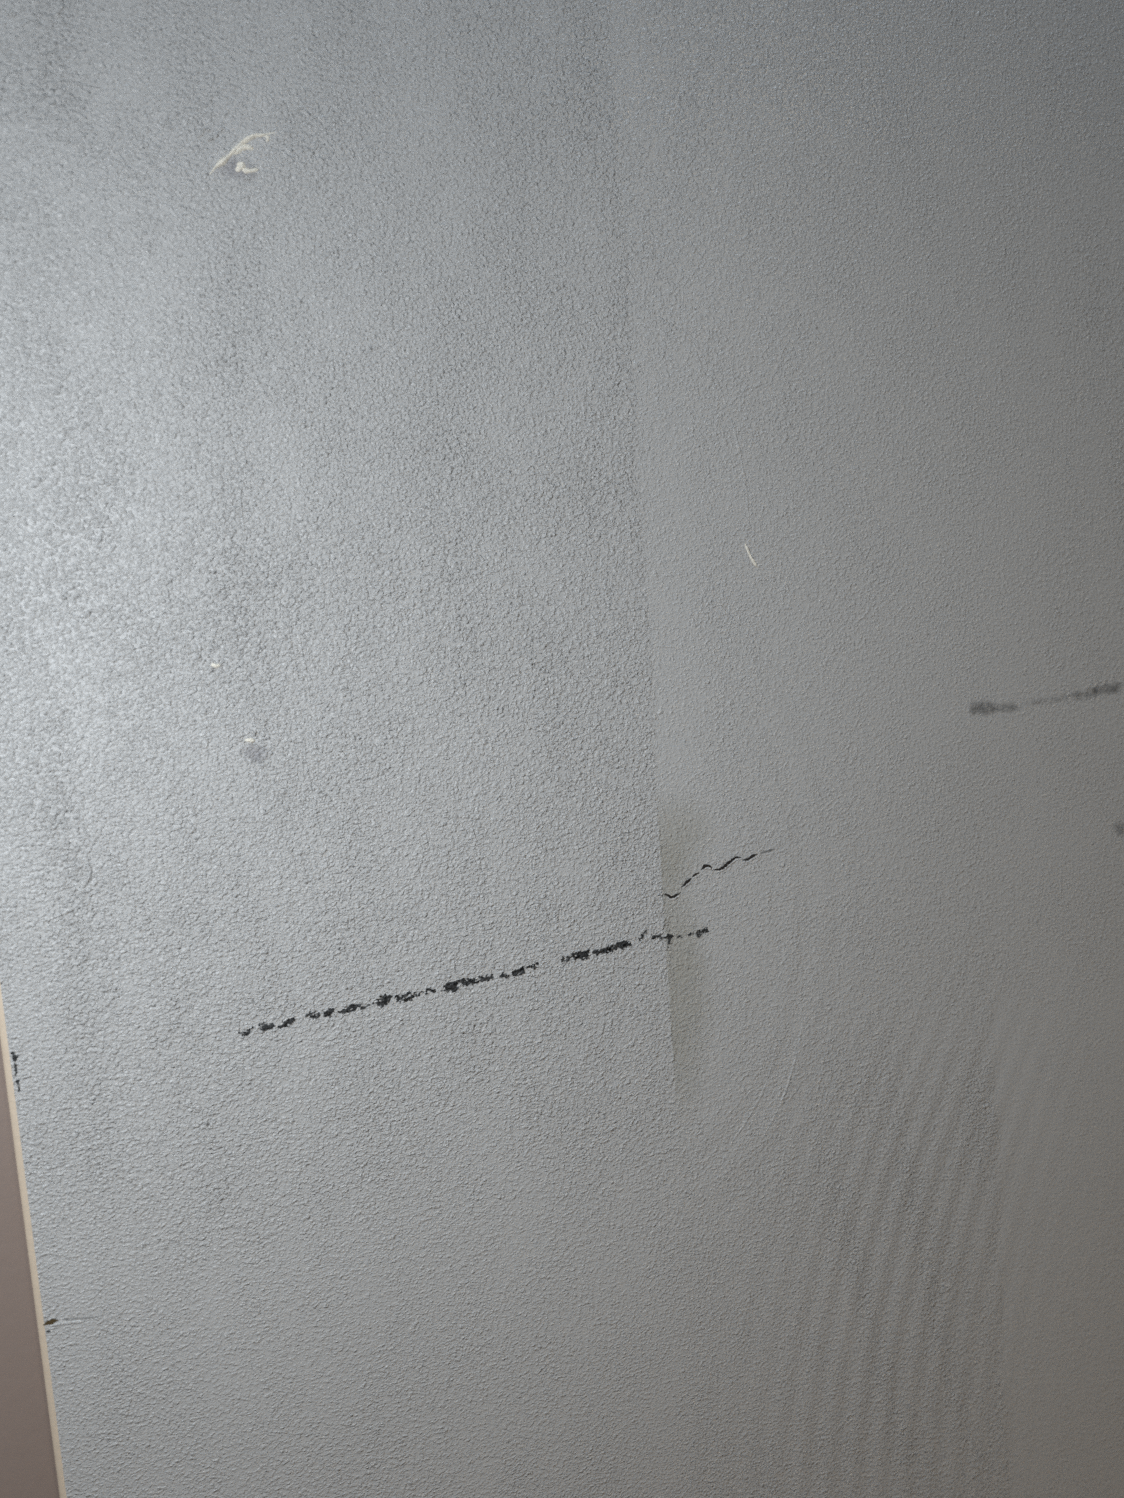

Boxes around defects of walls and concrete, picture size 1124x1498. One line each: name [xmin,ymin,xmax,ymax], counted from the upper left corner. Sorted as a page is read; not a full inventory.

peeling [197,126,274,180]
crack [664,854,758,901]